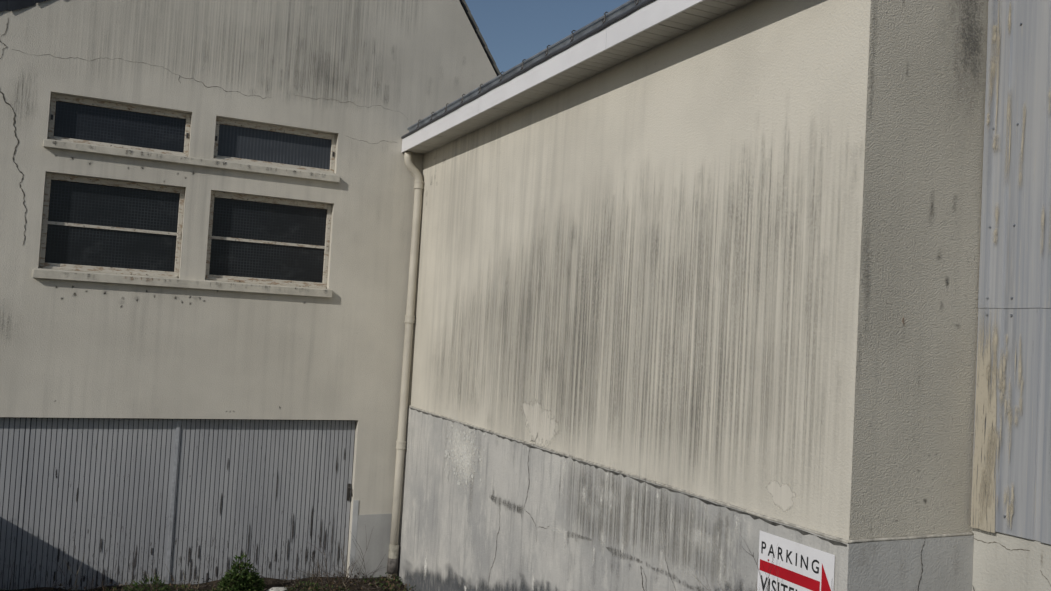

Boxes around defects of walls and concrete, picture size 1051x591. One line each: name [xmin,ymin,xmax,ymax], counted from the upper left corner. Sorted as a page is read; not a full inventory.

crack [0,91,27,245]
peeling [971,327,1023,533]
water stain [405,557,549,591]
water stain [561,473,722,589]